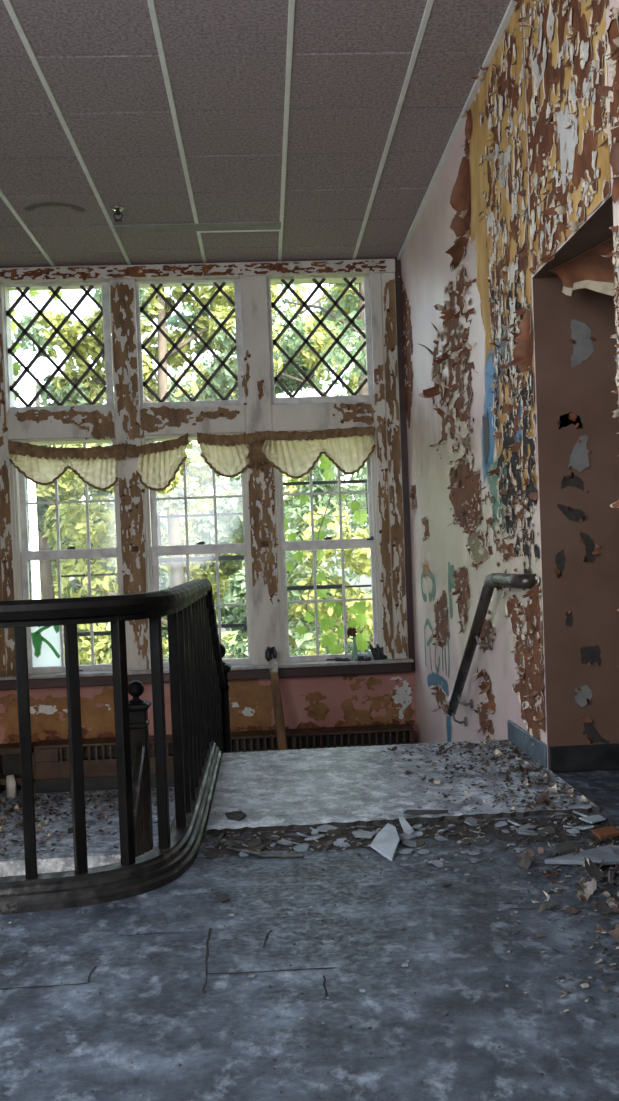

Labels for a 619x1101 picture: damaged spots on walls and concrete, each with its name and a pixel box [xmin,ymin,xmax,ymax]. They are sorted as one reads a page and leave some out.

peeling [0,0,619,824]
spalling [352,816,414,861]
crack [202,928,336,997]